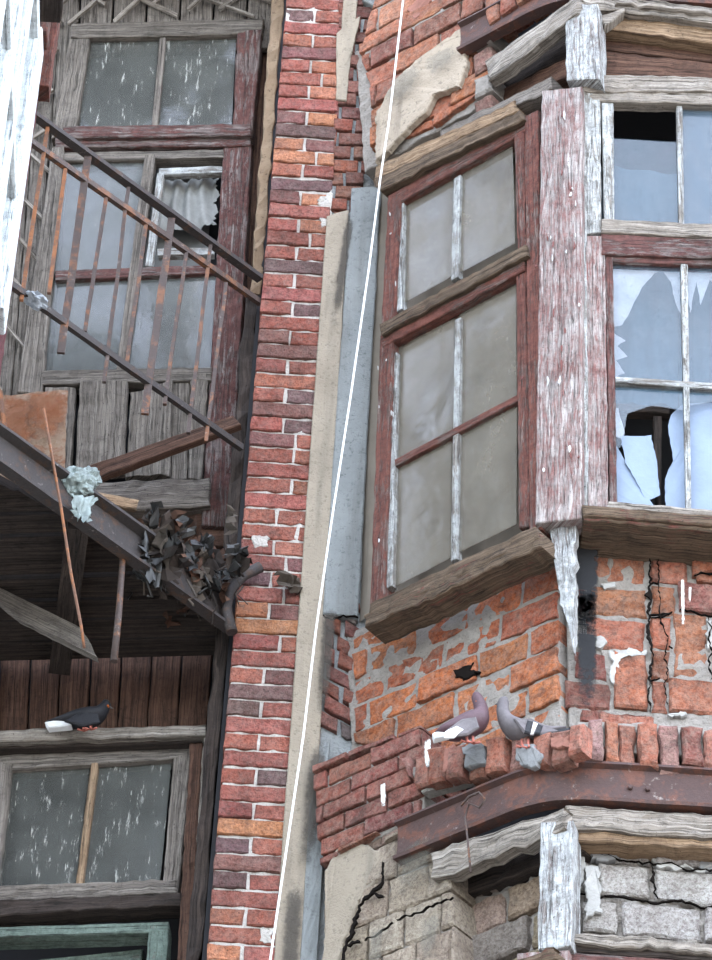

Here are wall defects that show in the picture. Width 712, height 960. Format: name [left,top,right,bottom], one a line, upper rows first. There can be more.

rust [0,393,65,441]
spalling [600,582,616,591]
crack [644,558,712,713]
spalling [453,662,481,681]
spalling [596,635,648,687]
spalling [667,711,687,720]
spalling [443,743,487,773]
crack [341,861,454,960]